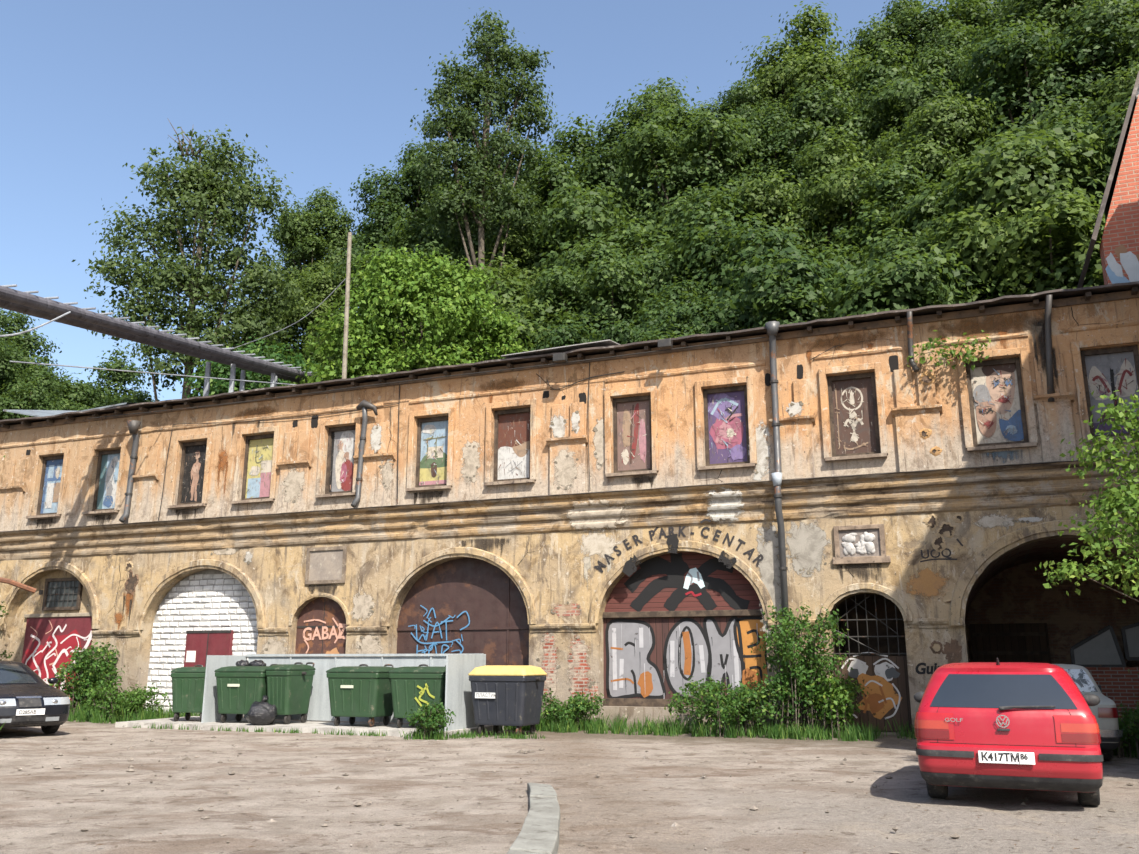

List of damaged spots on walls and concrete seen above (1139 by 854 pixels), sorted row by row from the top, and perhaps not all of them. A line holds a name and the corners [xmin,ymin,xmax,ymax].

corrosion [217,450,228,492]
flaking render [461,441,480,484]
flaking render [543,391,605,490]
spalling [919,428,942,457]
flaking render [567,499,629,532]
flaking render [707,487,744,523]
spalling [536,633,599,704]